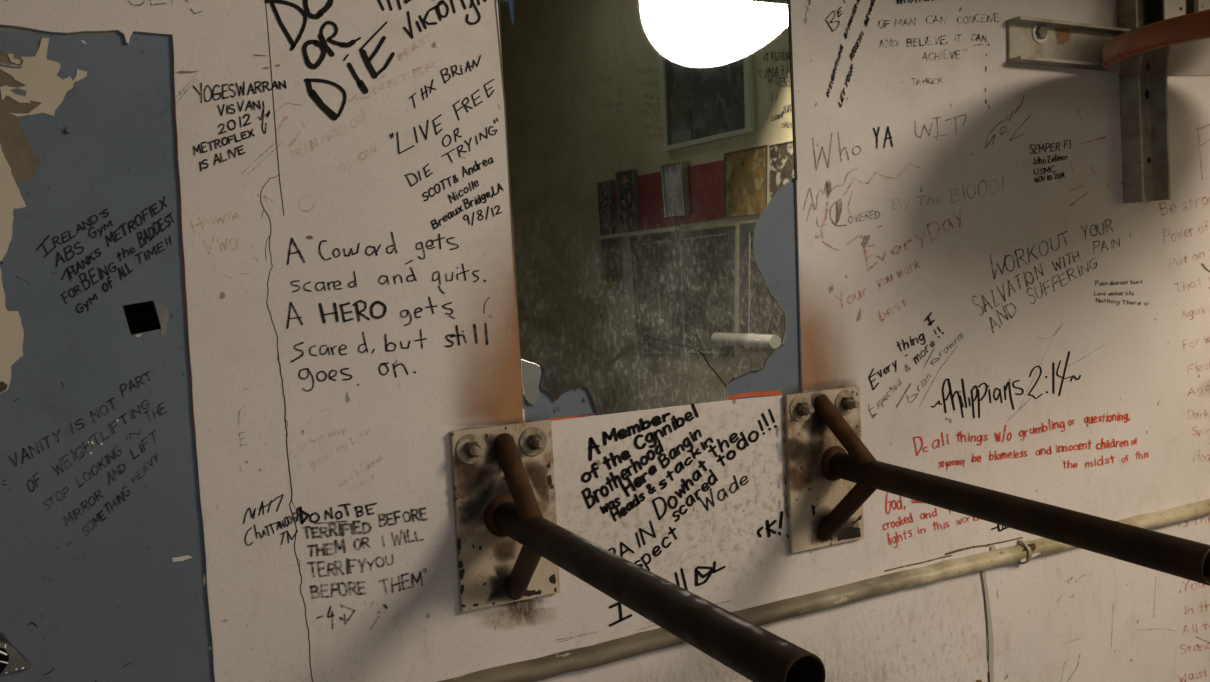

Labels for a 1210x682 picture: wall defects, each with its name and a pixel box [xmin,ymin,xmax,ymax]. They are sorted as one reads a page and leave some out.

rust [470,285,523,425]